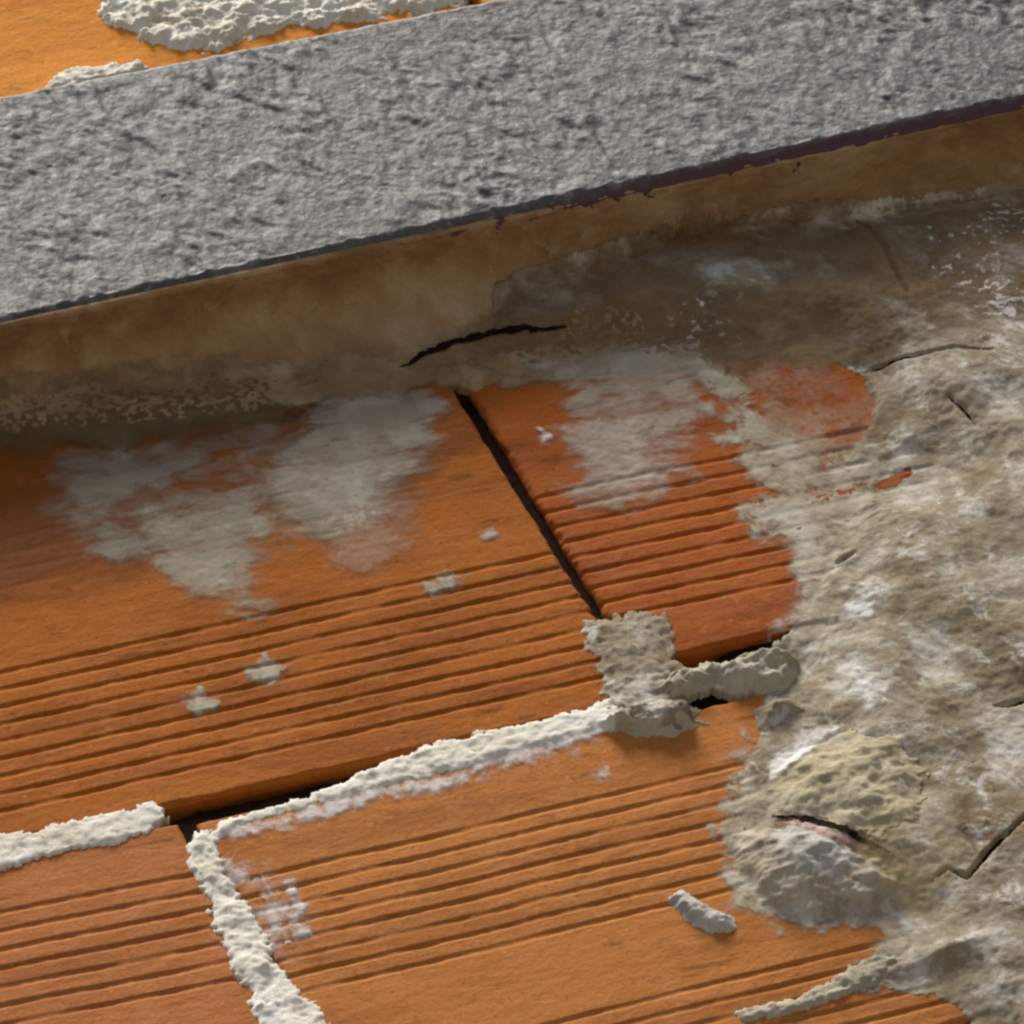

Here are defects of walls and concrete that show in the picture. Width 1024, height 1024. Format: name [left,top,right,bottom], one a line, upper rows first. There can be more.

crack [399,324,567,367]
crack [855,348,989,375]
spalling [756,366,861,440]
crack [950,398,975,425]
leakage [0,374,428,581]
spalling [806,467,911,504]
efflorescence [218,713,616,837]
crack [772,815,891,852]
crack [932,821,1024,883]
efflorescence [259,886,298,944]